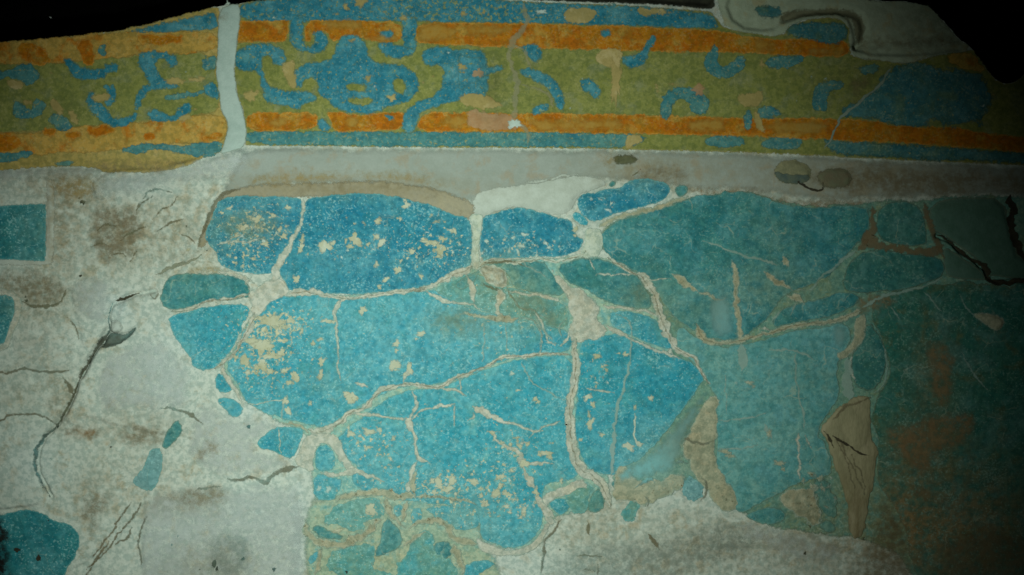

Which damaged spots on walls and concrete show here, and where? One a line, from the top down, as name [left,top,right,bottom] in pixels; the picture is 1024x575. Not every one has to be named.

crack [825,68,891,147]
crack [798,181,823,192]
spalling [102,328,136,348]
crack [0,189,1024,575]
peeling [185,180,1024,575]